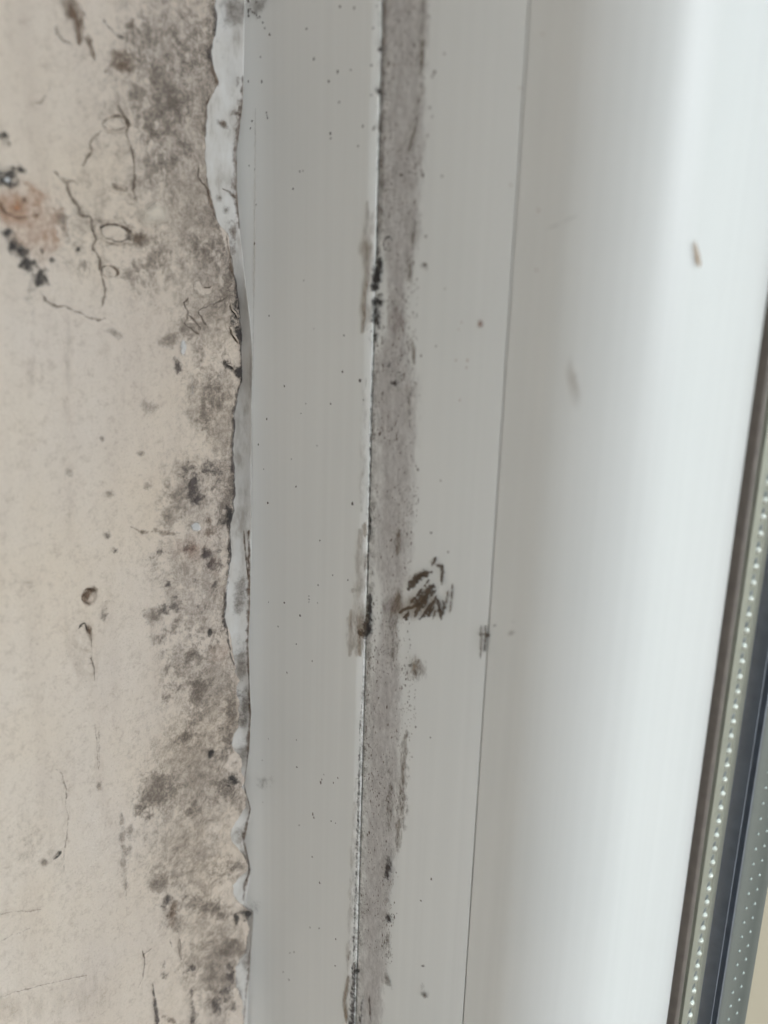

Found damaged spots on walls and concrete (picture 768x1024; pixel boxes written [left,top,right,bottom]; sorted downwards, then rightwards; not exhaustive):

water stain [197,0,270,136]
water stain [0,167,26,189]
water stain [1,228,55,287]
crack [44,131,106,321]
crack [118,105,136,201]
water stain [171,76,263,925]
water stain [343,2,436,1024]
water stain [153,875,177,930]
water stain [203,940,251,1013]